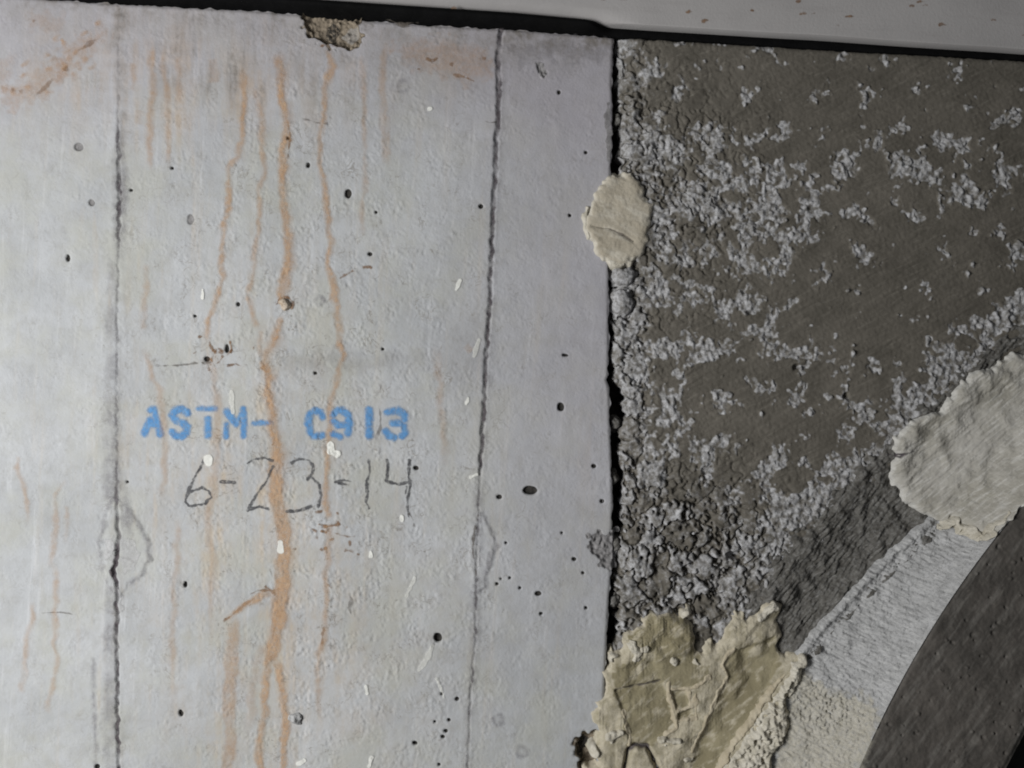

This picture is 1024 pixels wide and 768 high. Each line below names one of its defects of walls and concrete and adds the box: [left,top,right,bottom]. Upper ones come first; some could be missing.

spalling [301,13,365,51]
rust [278,83,291,182]
crack [115,131,123,236]
crack [480,29,502,467]
rust [312,455,340,550]
rust [224,366,290,768]
crack [472,526,488,605]
crack [104,492,150,768]
spalling [572,730,596,768]